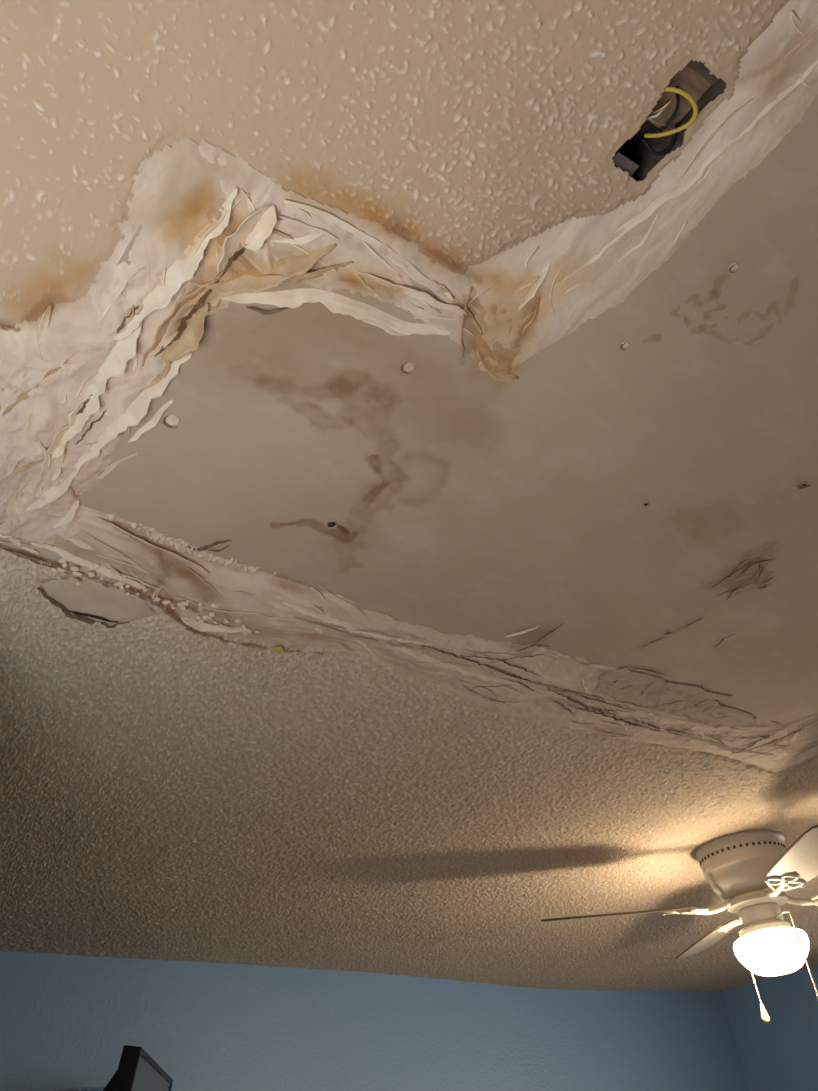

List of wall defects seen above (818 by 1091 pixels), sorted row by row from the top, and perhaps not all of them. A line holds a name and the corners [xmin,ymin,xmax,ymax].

peeling [0,187,482,529]
spalling [37,575,156,628]
peeling [596,667,757,729]